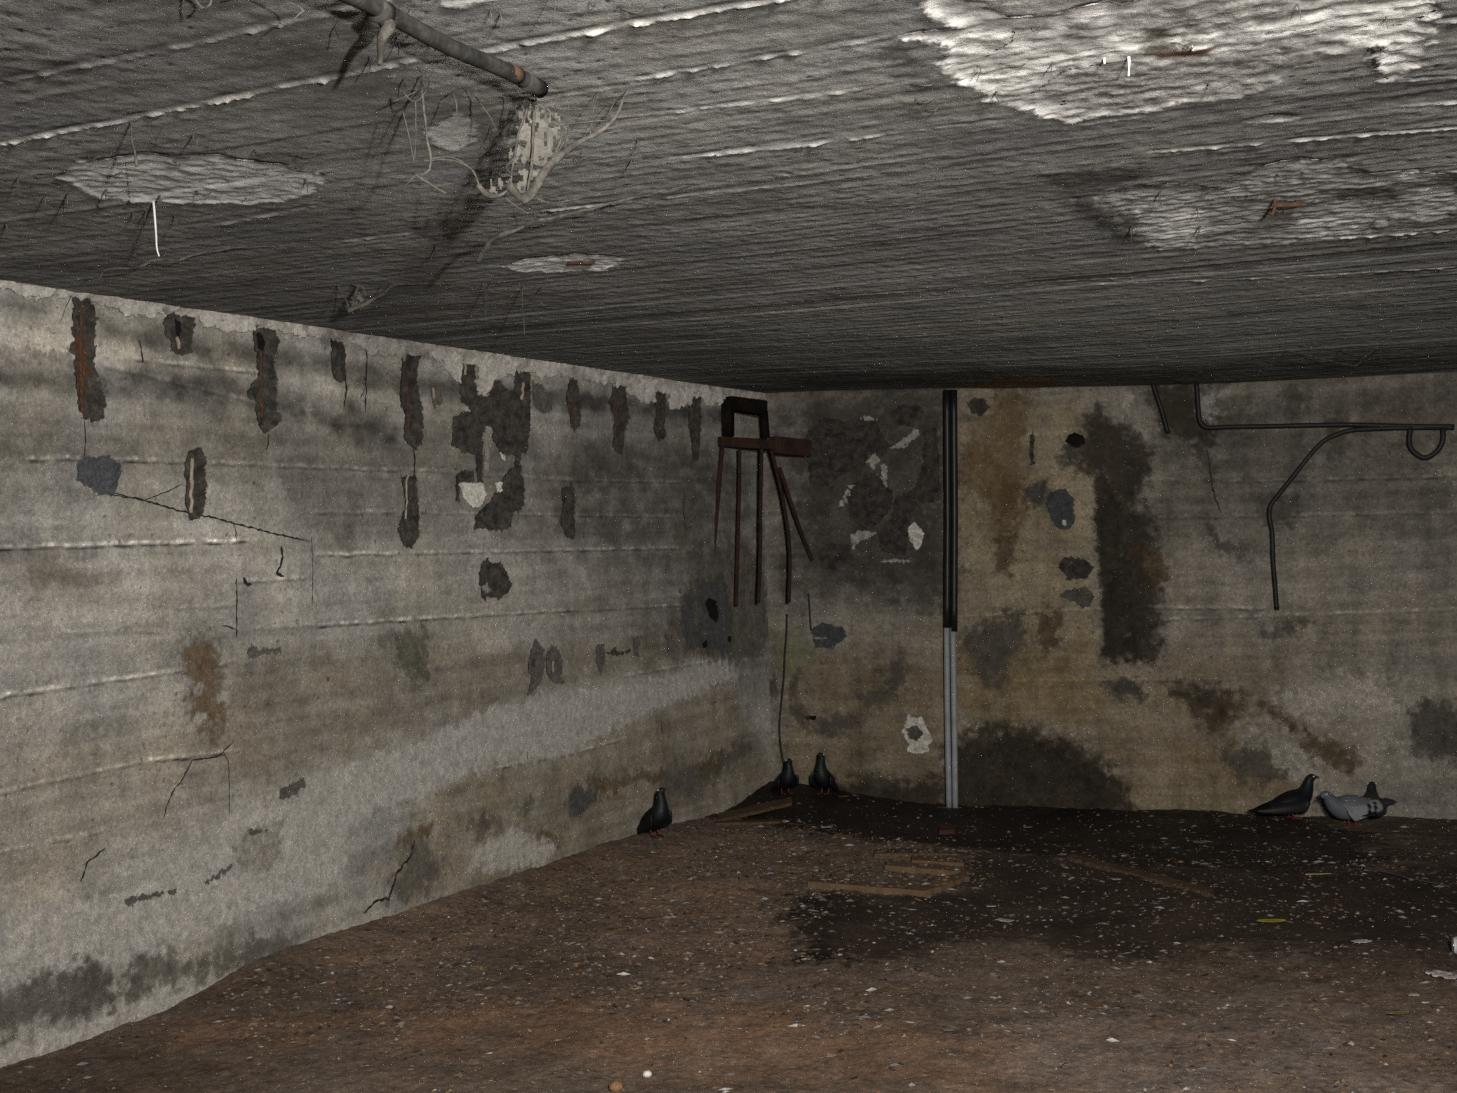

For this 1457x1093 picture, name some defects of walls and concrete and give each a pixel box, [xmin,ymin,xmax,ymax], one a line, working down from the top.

leakage [883,46,938,91]
leakage [1049,167,1145,235]
spalling [61,296,144,501]
spalling [184,447,208,521]
spalling [247,325,282,451]
spalling [397,354,581,549]
leakage [1069,384,1238,701]
crack [164,741,234,817]
leakage [0,546,904,1068]
leakage [725,722,1457,966]
leakage [1169,654,1457,796]